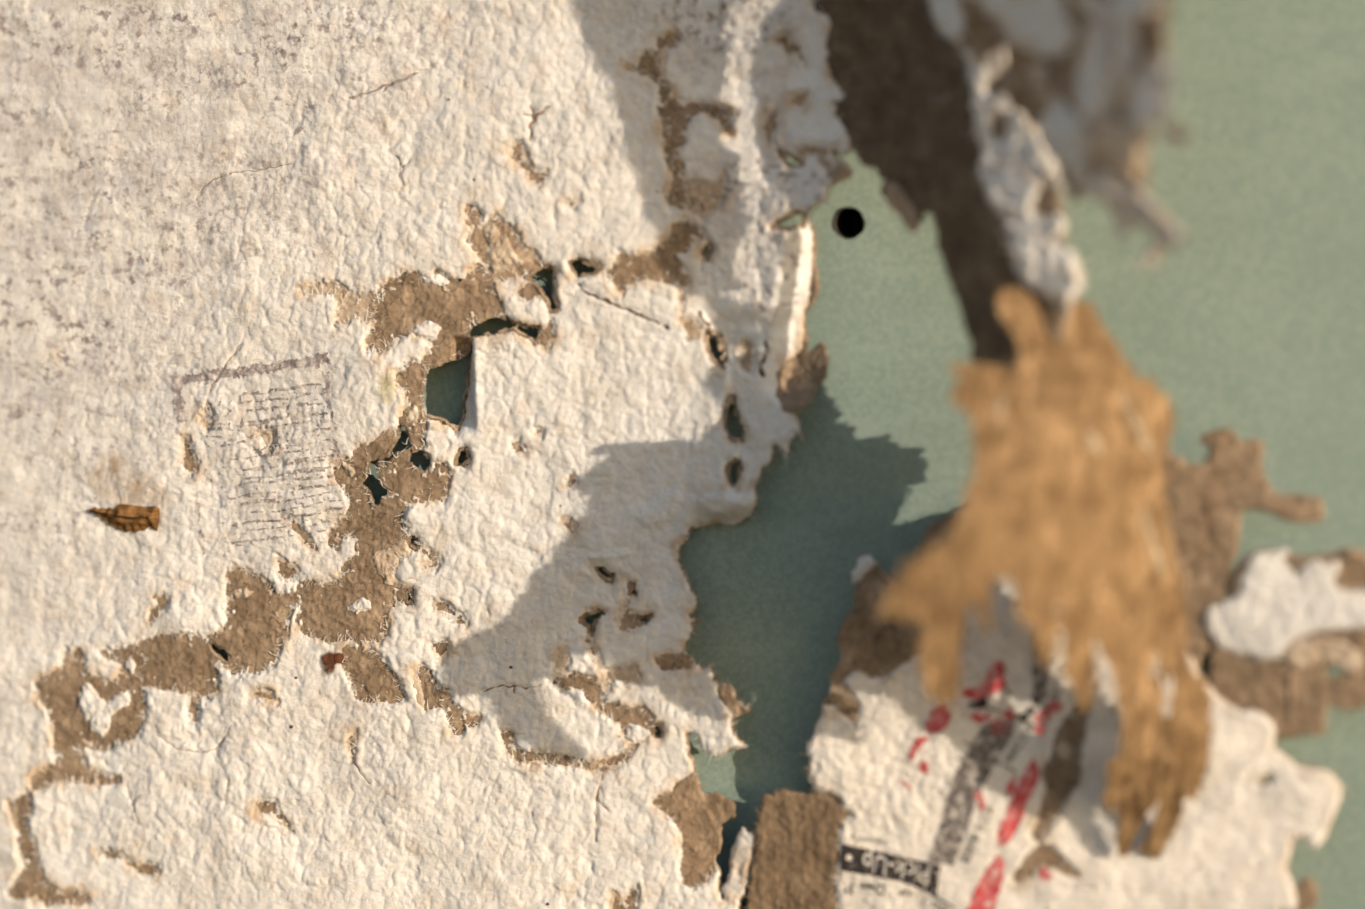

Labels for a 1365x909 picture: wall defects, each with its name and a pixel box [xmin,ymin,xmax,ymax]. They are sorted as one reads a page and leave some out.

peeling [511,139,548,185]
peeling [598,34,738,341]
peeling [764,0,1055,369]
peeling [533,313,555,350]
peeling [740,341,753,372]
peeling [776,341,830,415]
peeling [9,204,546,907]
peeling [1281,636,1364,676]
peeling [828,680,860,725]
peeling [1012,686,1096,884]
peeling [653,767,735,888]